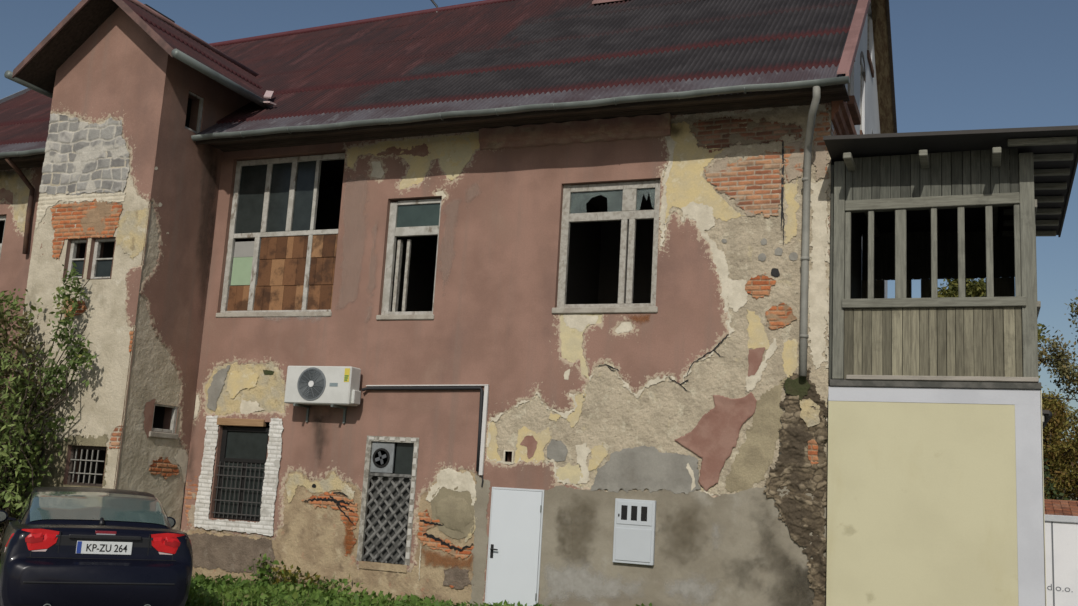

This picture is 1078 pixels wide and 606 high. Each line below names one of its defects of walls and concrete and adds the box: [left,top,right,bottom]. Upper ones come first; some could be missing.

peeling [0,113,480,606]
peeling [485,104,836,496]
crack [670,334,729,392]